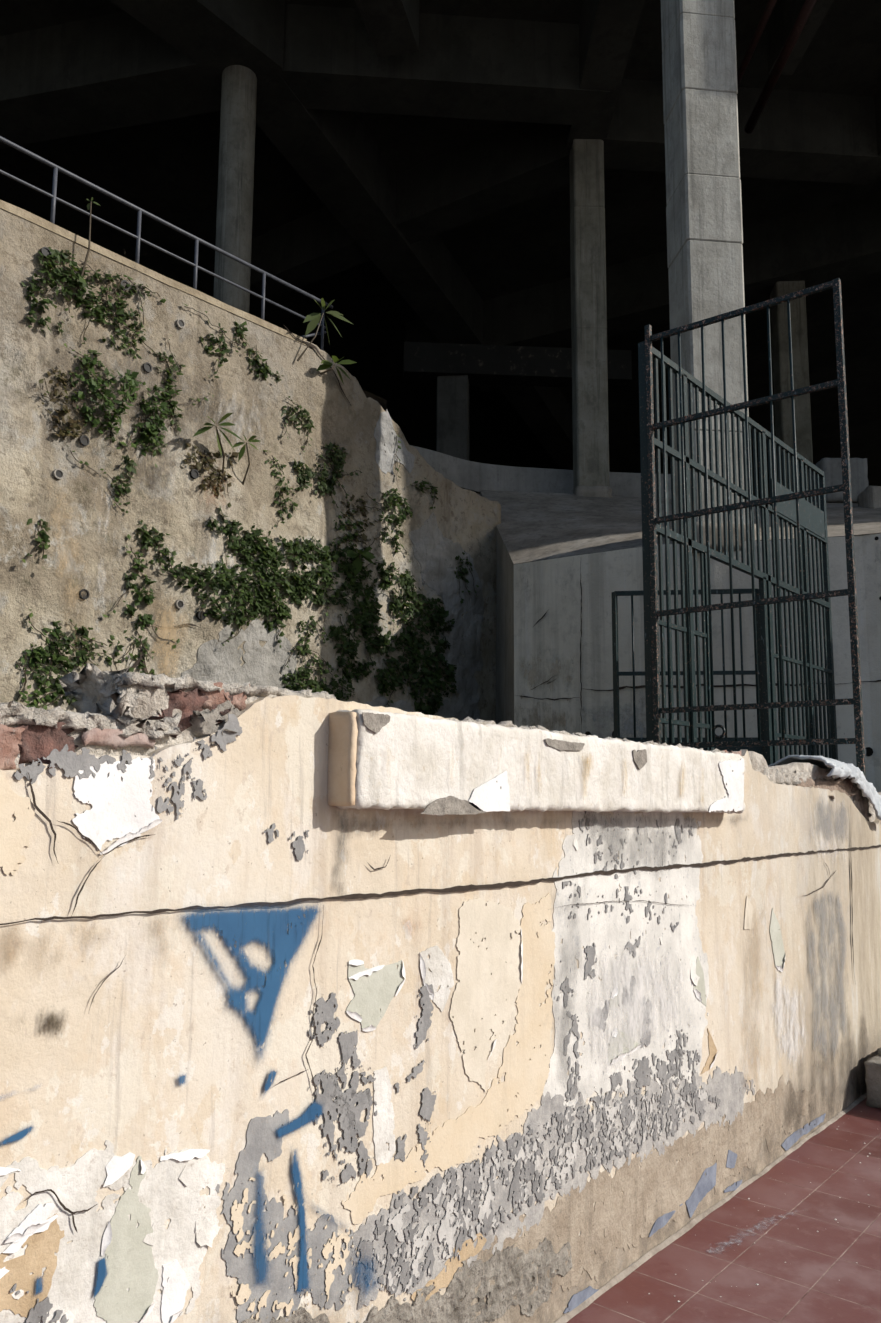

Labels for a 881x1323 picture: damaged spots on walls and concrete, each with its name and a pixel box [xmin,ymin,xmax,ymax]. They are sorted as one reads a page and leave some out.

peeling [0,714,242,875]
spalling [545,738,585,751]
spalling [632,749,647,770]
peeling [0,758,826,1323]
crack [0,773,881,1099]
damp [808,894,866,1099]